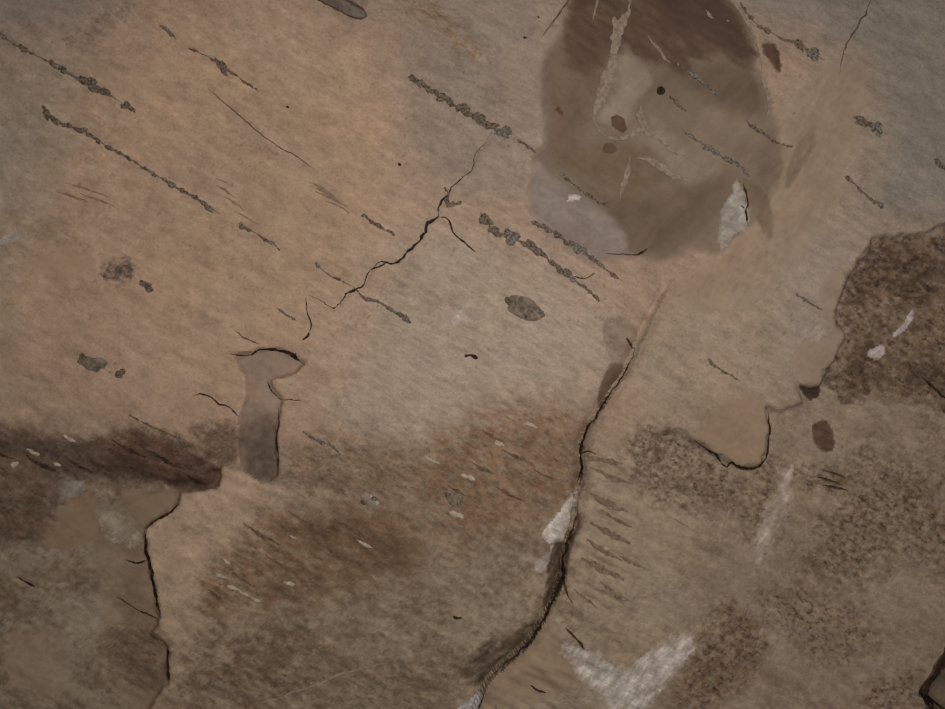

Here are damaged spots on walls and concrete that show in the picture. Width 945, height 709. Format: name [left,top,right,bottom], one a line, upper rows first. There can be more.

damp [534,0,762,207]
crack [232,132,492,364]
damp [717,179,750,251]
spalling [234,346,305,413]
damp [73,232,633,709]
crack [577,338,635,484]
peeling [695,391,770,470]
spalling [812,418,836,455]
efflorescence [867,344,886,360]
crack [118,506,177,619]
crack [478,507,584,709]
damp [557,406,945,709]